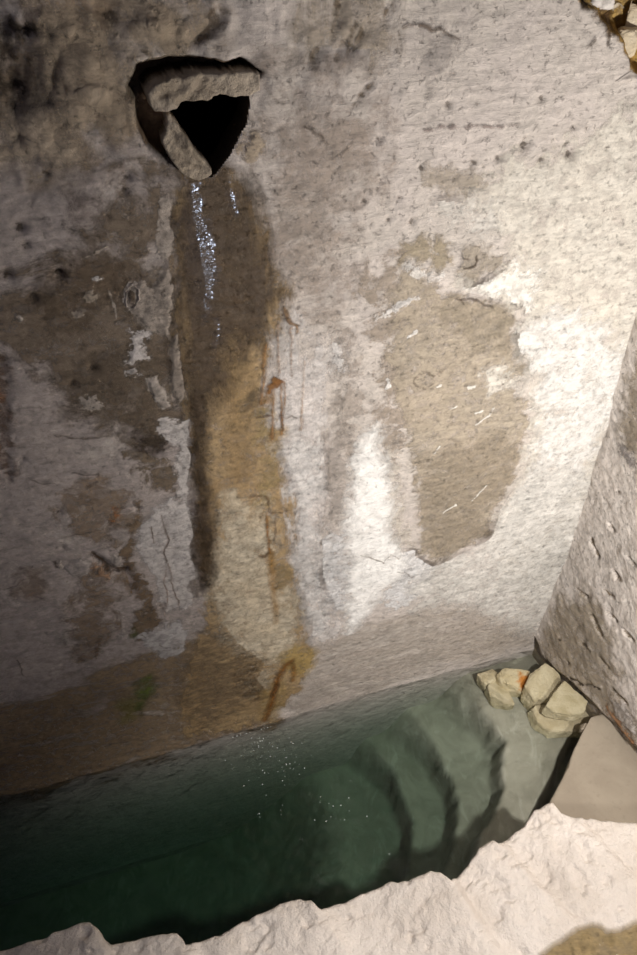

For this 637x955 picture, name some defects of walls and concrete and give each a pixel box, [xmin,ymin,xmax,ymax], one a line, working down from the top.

water stain [35,0,131,51]
water stain [0,29,76,142]
corrosion [260,307,298,442]
water stain [0,88,637,801]
corrosion [263,646,315,721]